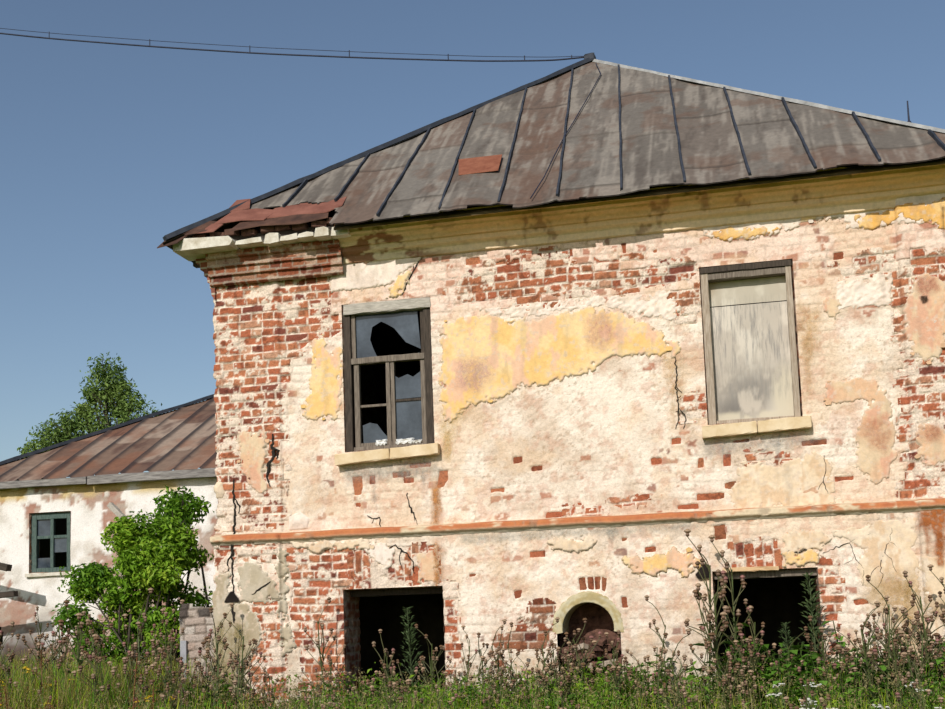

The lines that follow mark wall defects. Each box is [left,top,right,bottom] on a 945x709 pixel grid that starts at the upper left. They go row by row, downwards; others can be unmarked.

flaking render [701,193,945,243]
flaking render [438,243,701,423]
spalling [676,247,945,509]
spalling [212,257,465,706]
flaking render [714,517,945,669]